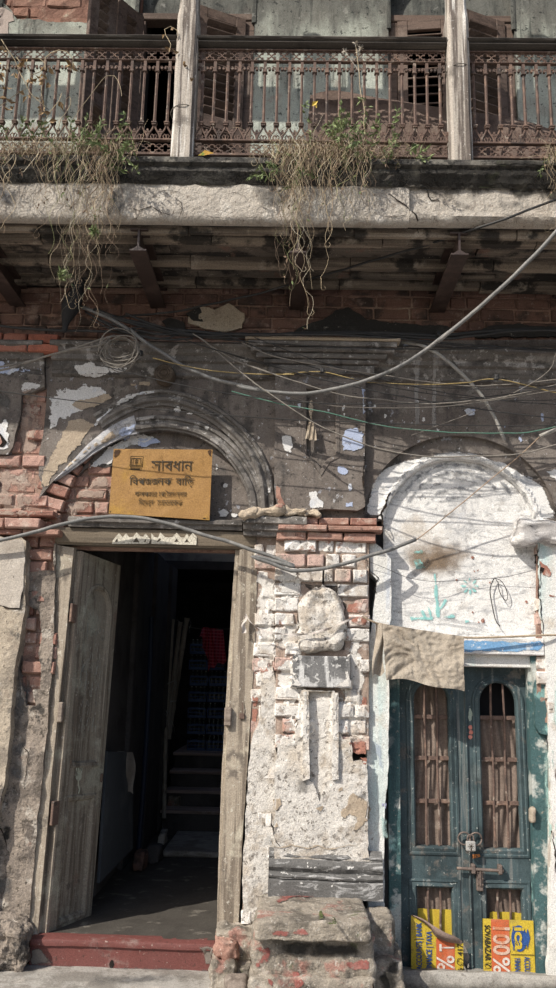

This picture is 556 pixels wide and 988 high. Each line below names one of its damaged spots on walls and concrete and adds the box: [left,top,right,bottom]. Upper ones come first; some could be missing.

flaking render [0,0,89,33]
flaking render [0,333,61,392]
peeling [0,419,9,449]
flaking render [41,362,160,487]
flaking render [347,603,368,626]
flaking render [349,741,367,764]
flaking render [339,787,371,830]